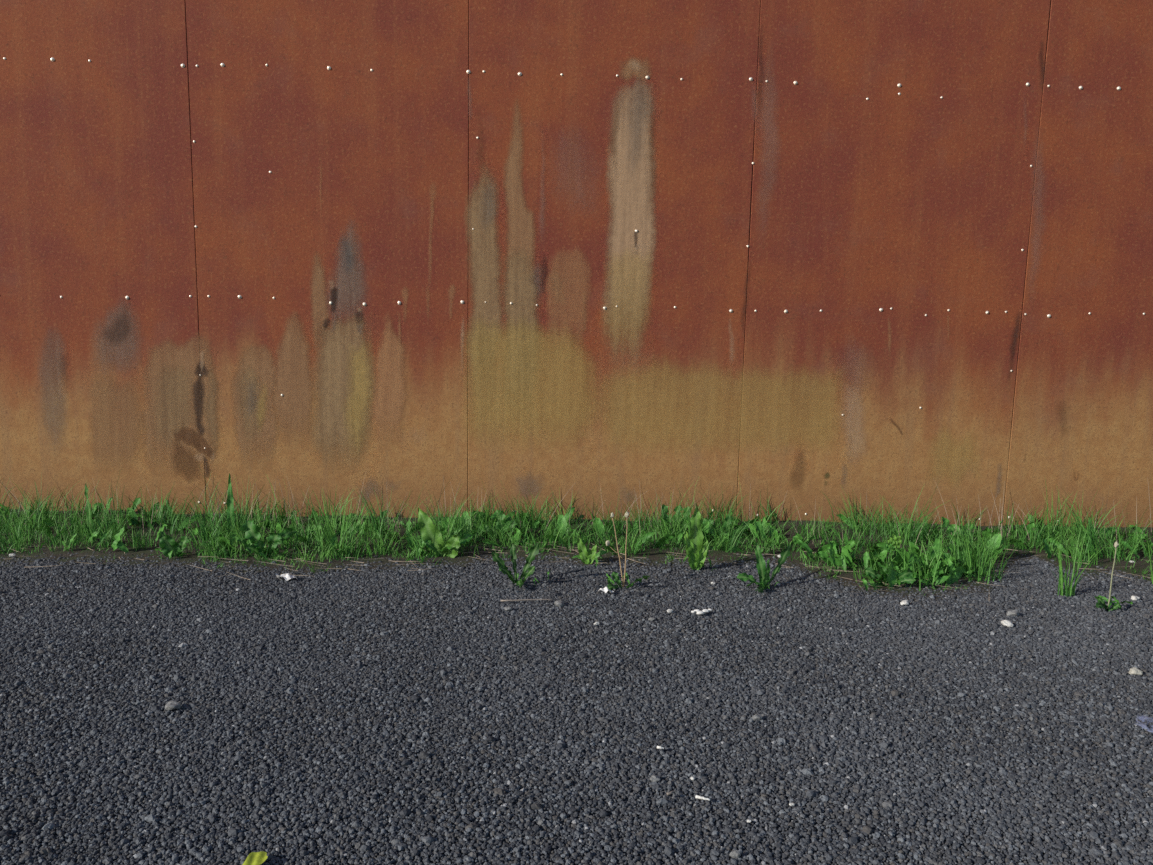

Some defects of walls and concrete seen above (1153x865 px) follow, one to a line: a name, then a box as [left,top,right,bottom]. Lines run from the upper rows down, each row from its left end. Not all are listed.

rust [145,342,216,453]
rust [275,245,403,452]
rust [468,120,537,389]
rust [606,60,655,330]